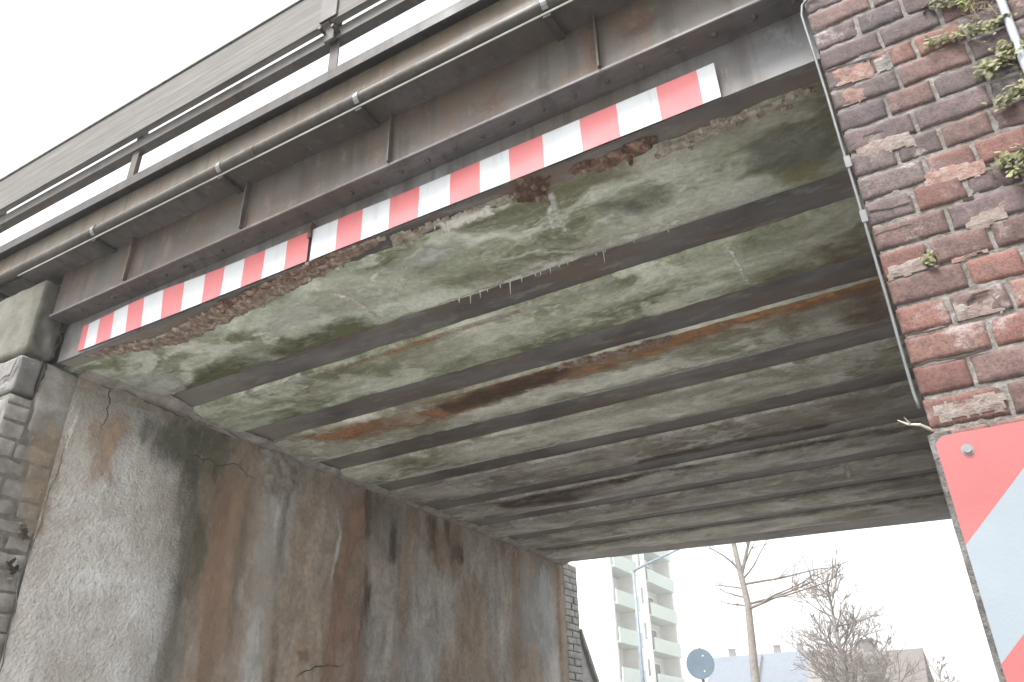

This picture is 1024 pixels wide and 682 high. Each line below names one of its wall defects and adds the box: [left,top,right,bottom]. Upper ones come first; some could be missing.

spalling [856,131,917,157]
spalling [924,159,987,186]
spalling [84,175,551,357]
damp [408,205,494,268]
damp [441,256,579,305]
damp [547,193,565,231]
damp [595,220,679,263]
rust [308,277,896,441]
crack [101,367,257,483]
spalling [933,391,1007,423]
damp [142,420,228,682]
damp [242,608,262,682]